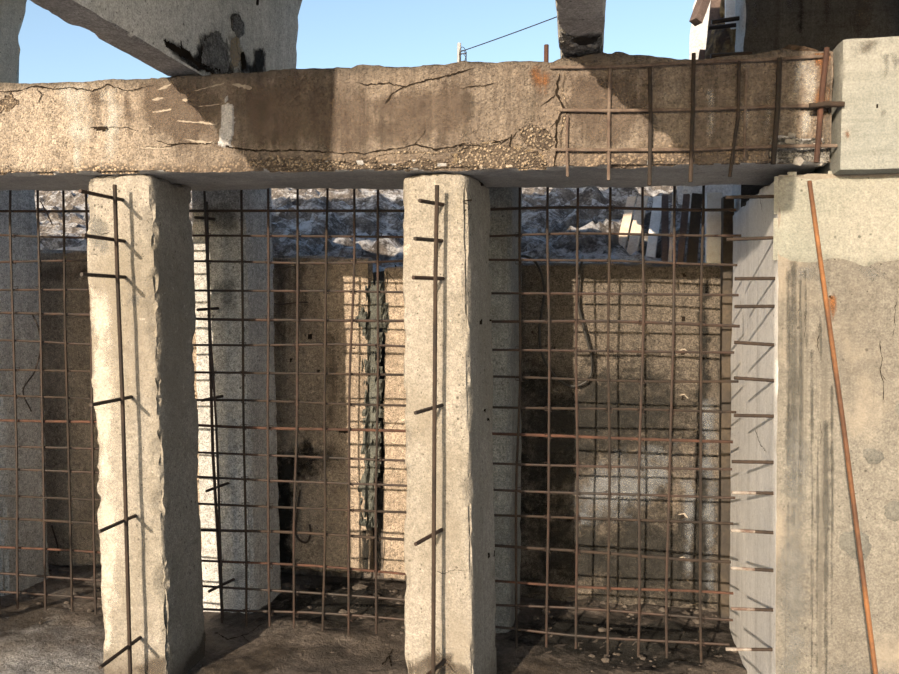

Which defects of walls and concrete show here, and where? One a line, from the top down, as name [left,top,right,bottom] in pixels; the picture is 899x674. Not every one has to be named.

spalling [0,92,19,114]
crack [0,84,144,103]
spalling [163,31,266,91]
crack [356,68,494,104]
crack [540,72,570,166]
spalling [0,184,142,674]
spalling [189,185,446,674]
spalling [251,29,845,663]
damp [520,282,718,607]
damp [786,263,822,490]
damp [811,387,834,591]
damp [499,614,735,674]